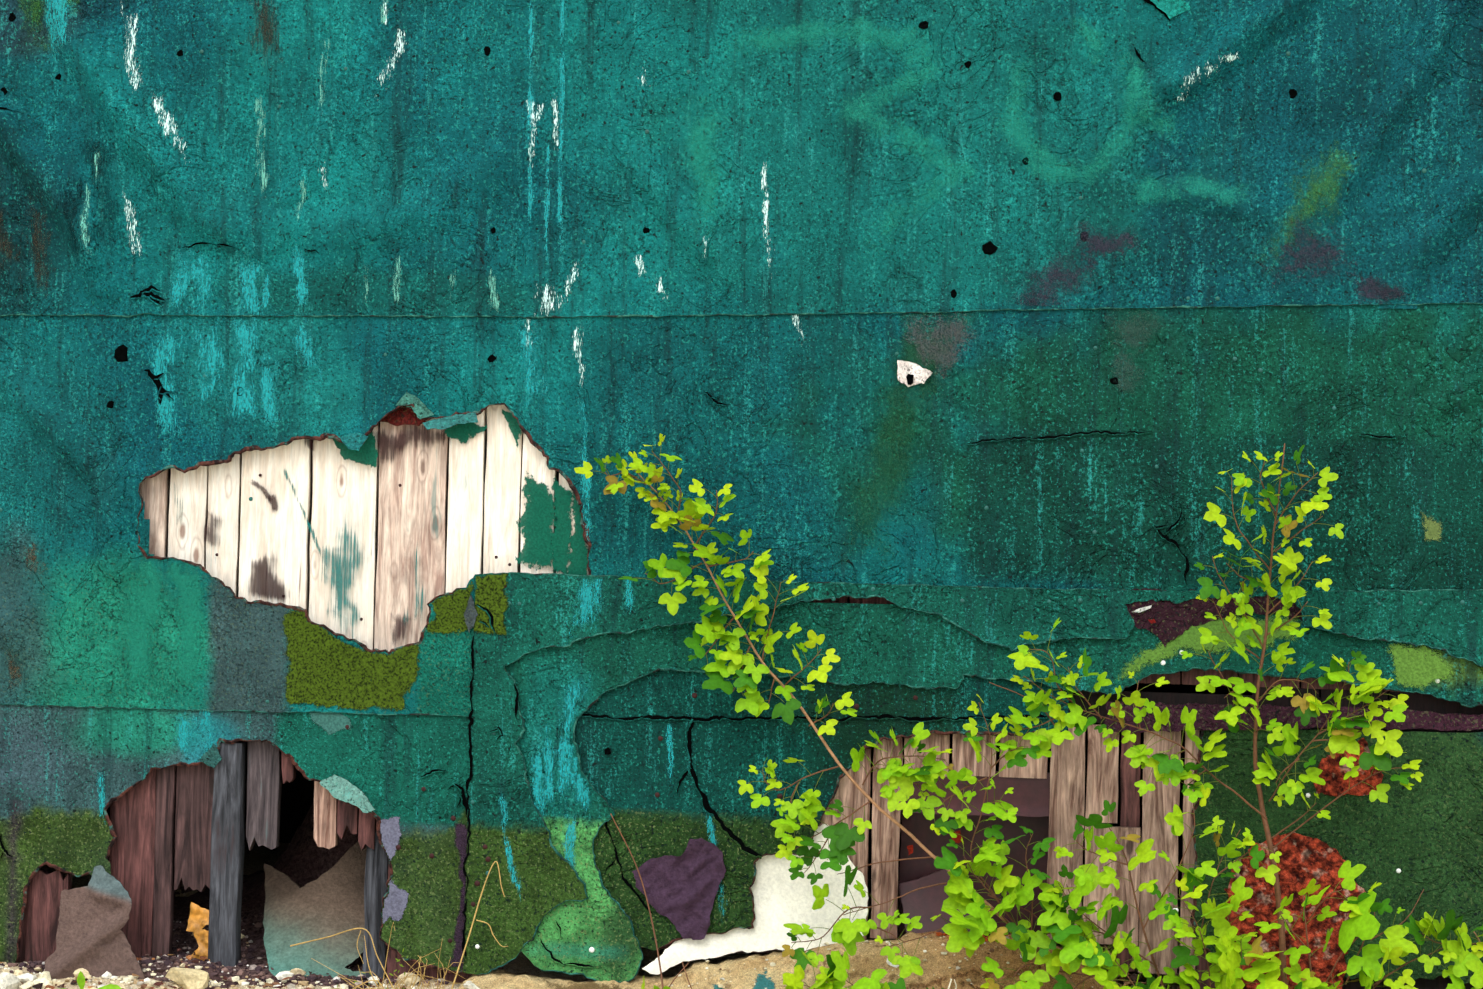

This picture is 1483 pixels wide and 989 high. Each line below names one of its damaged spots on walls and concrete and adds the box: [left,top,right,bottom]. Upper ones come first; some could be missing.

damp [58,142,114,253]
peeling [897,360,933,387]
peeling [340,433,368,451]
peeling [380,392,487,444]
peeling [502,410,522,447]
peeling [282,471,588,735]
damp [174,710,220,757]
damp [97,772,105,816]
peeling [320,774,402,860]
crack [421,604,519,966]
crack [581,714,1051,859]
peeling [383,879,409,923]